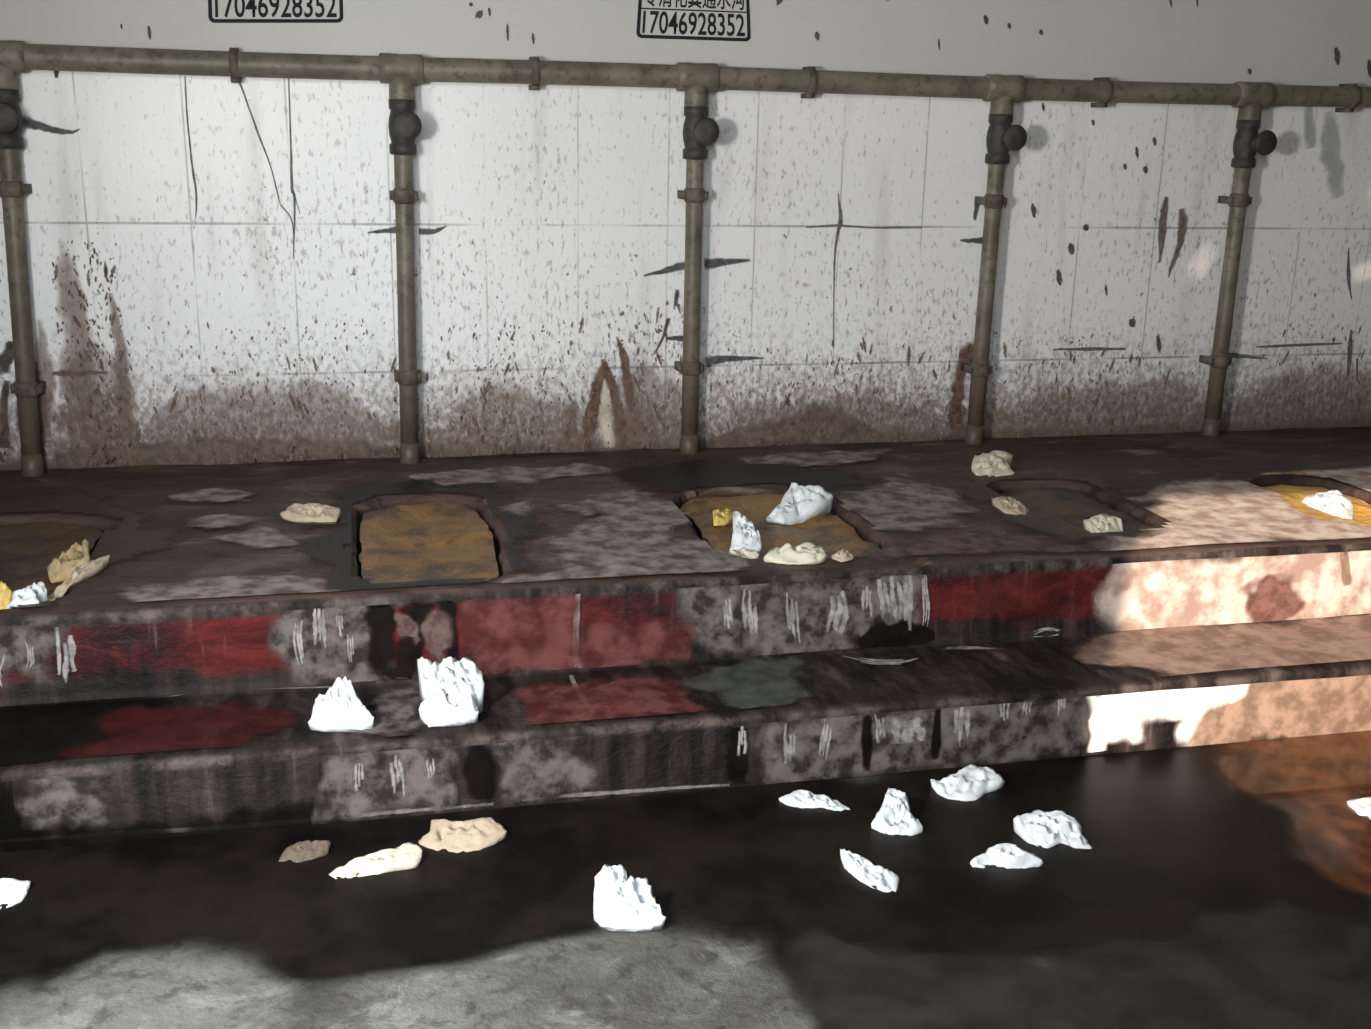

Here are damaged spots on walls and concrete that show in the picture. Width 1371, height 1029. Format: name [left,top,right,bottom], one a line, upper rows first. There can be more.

corrosion [0,341,19,448]
corrosion [35,262,135,461]
water stain [52,240,400,468]
corrosion [562,338,657,450]
water stain [426,301,950,497]
water stain [983,332,1200,438]
water stain [1281,494,1371,527]
water stain [56,632,76,679]
water stain [0,694,184,766]
water stain [685,589,811,709]
water stain [999,702,1032,720]
water stain [0,707,1371,1029]